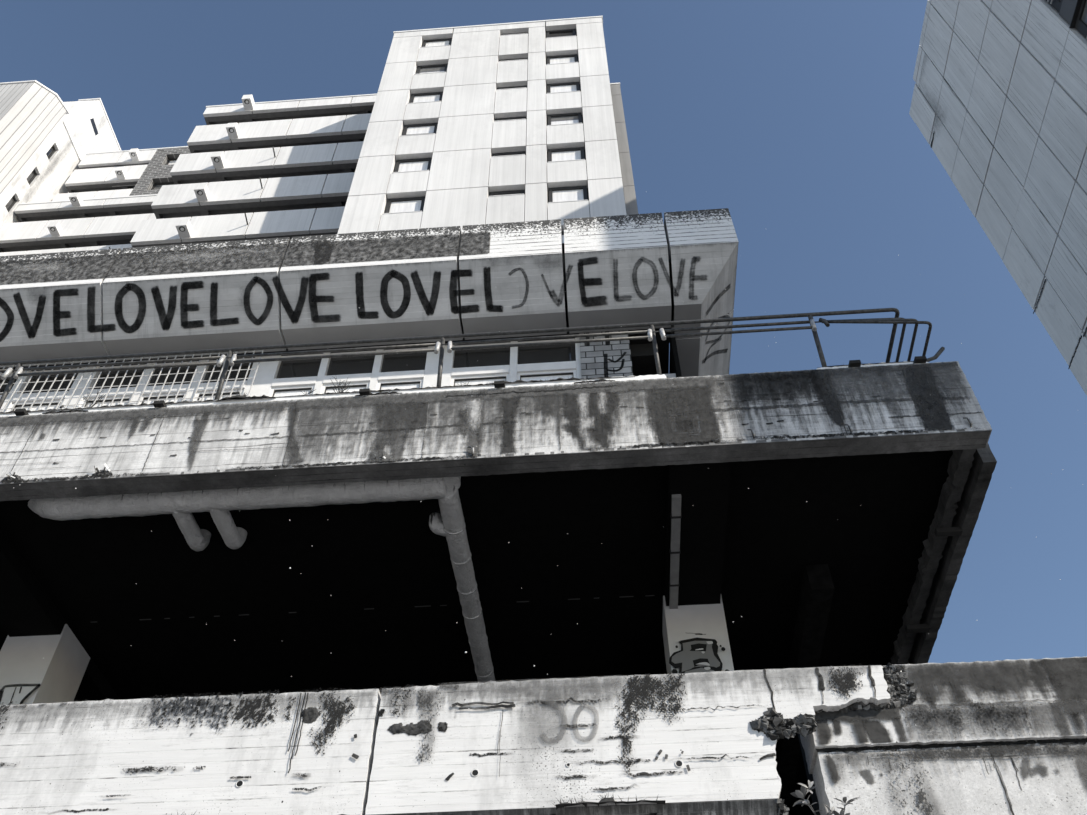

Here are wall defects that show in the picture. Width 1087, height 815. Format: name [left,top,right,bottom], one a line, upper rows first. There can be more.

damp [0,362,968,470]
damp [0,702,83,729]
damp [281,692,322,792]
damp [815,657,1087,815]